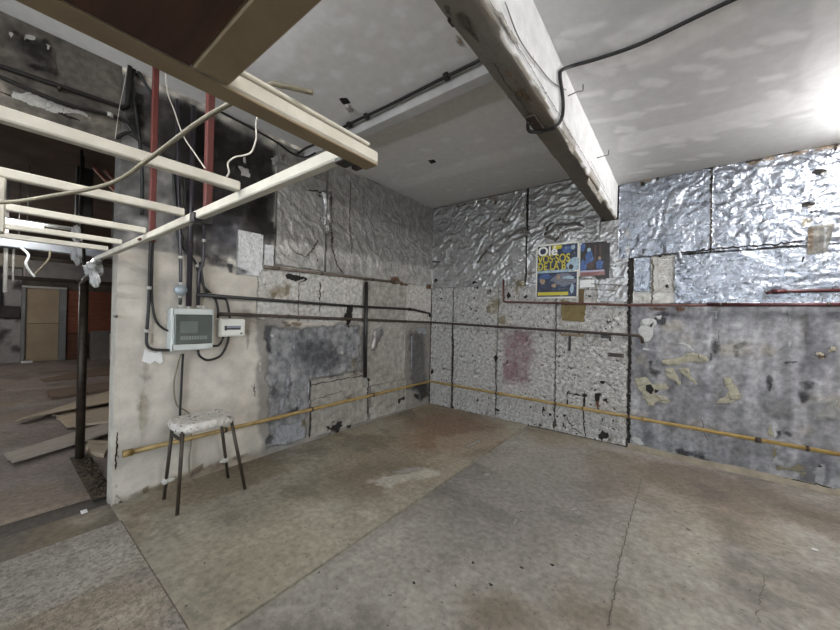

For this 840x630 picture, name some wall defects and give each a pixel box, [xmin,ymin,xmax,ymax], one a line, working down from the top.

crack [295,180,352,274]
flaking render [638,315,662,351]
flaking render [634,347,709,406]
flaking render [717,377,742,404]
crack [608,478,642,626]